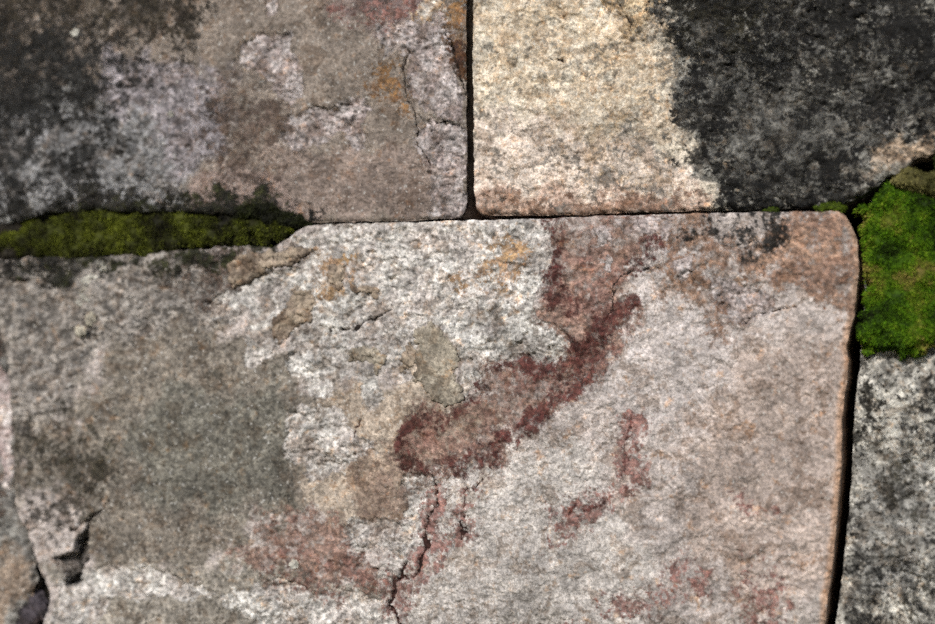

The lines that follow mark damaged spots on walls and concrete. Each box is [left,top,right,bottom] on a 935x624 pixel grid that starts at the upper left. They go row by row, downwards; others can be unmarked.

leakage [0,0,218,133]
crack [402,53,435,165]
leakage [644,0,935,211]
crack [70,504,107,531]
crack [388,479,439,624]
crack [459,478,483,540]